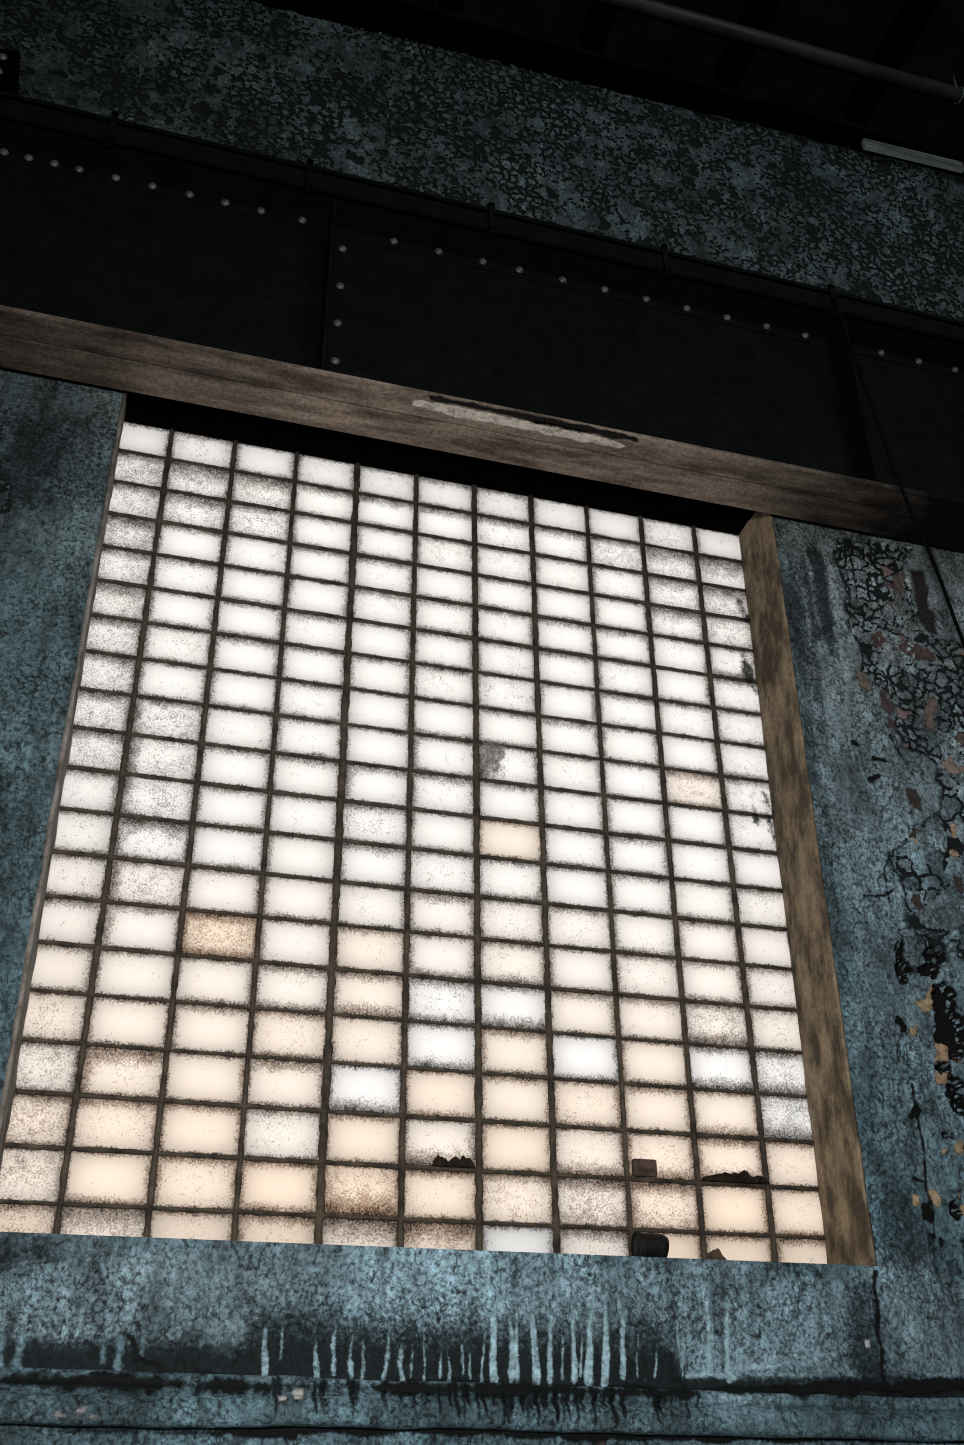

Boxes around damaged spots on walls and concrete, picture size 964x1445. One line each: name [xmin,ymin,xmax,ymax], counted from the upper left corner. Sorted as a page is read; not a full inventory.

peeling [833,538,964,1115]
flaking render [908,1103,921,1120]
peeling [941,1131,964,1154]
flaking render [912,1189,964,1246]
leakage [262,1334,282,1376]
leakage [314,1334,365,1378]
leakage [382,1304,638,1387]